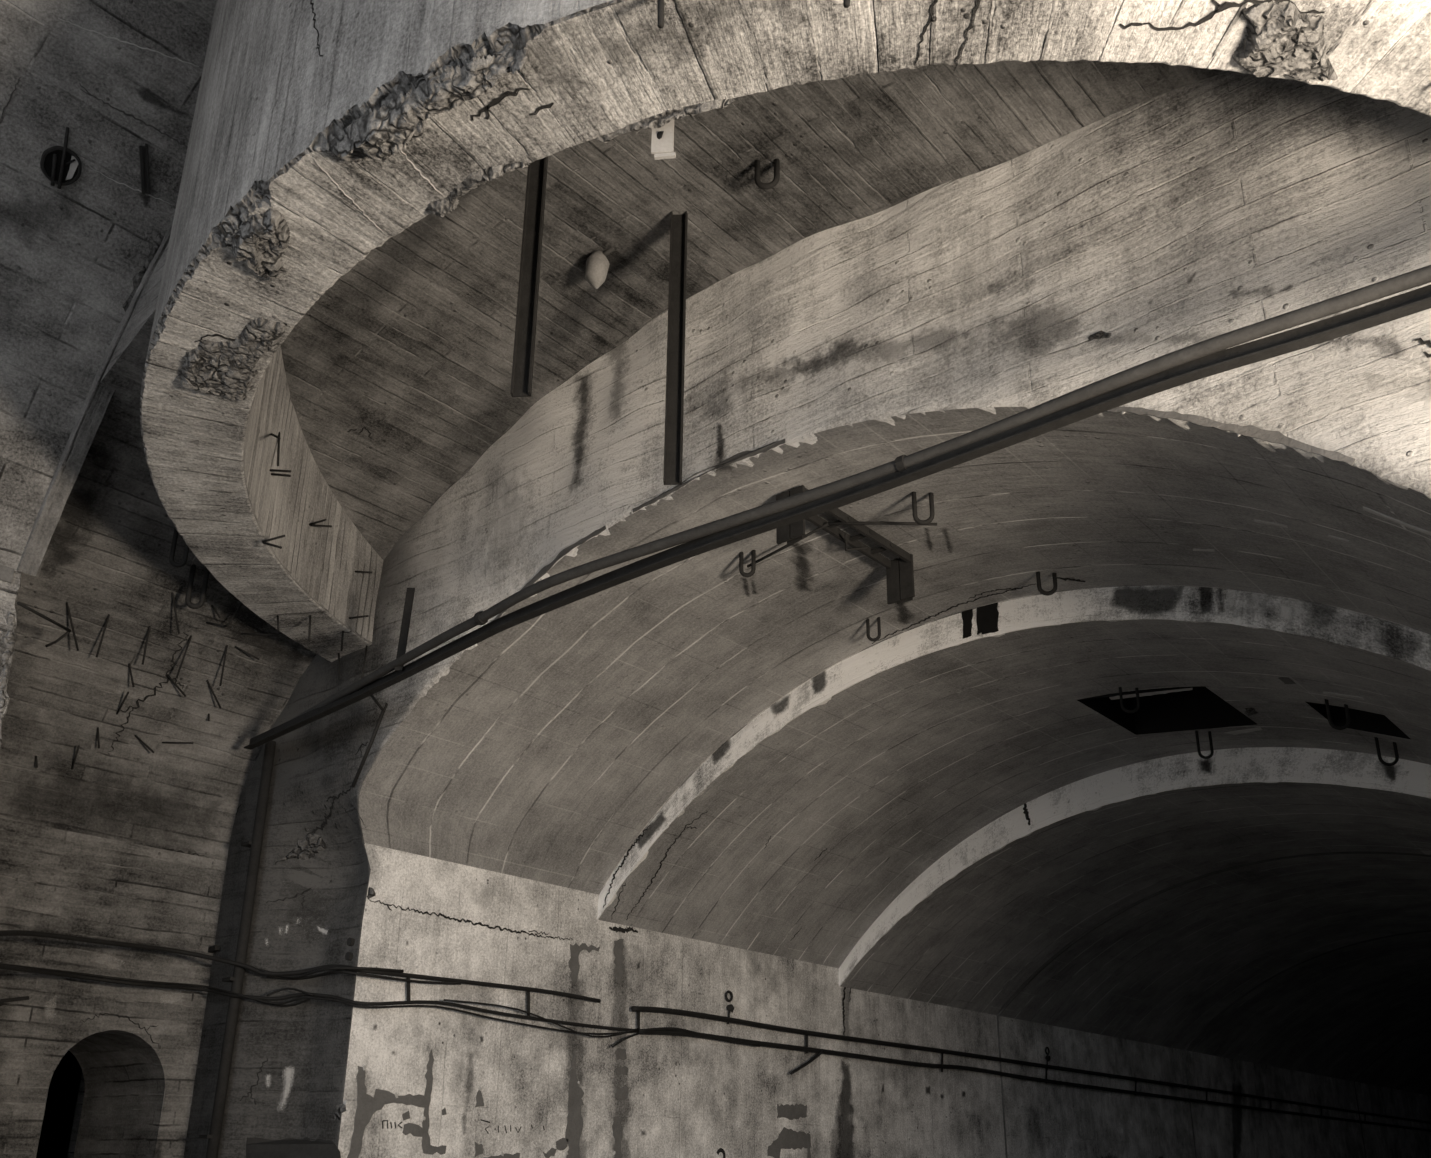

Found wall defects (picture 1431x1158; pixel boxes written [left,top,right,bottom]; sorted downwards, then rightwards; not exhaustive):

crack [914,0,938,65]
crack [1119,0,1325,31]
spalling [1232,1,1338,81]
spalling [324,47,530,163]
spalling [231,208,291,282]
spalling [176,318,287,402]
crack [1415,337,1431,358]
water stain [574,377,590,484]
crack [603,811,708,933]
crack [367,896,573,940]
peeling [333,1049,447,1158]
peeling [543,1052,584,1158]